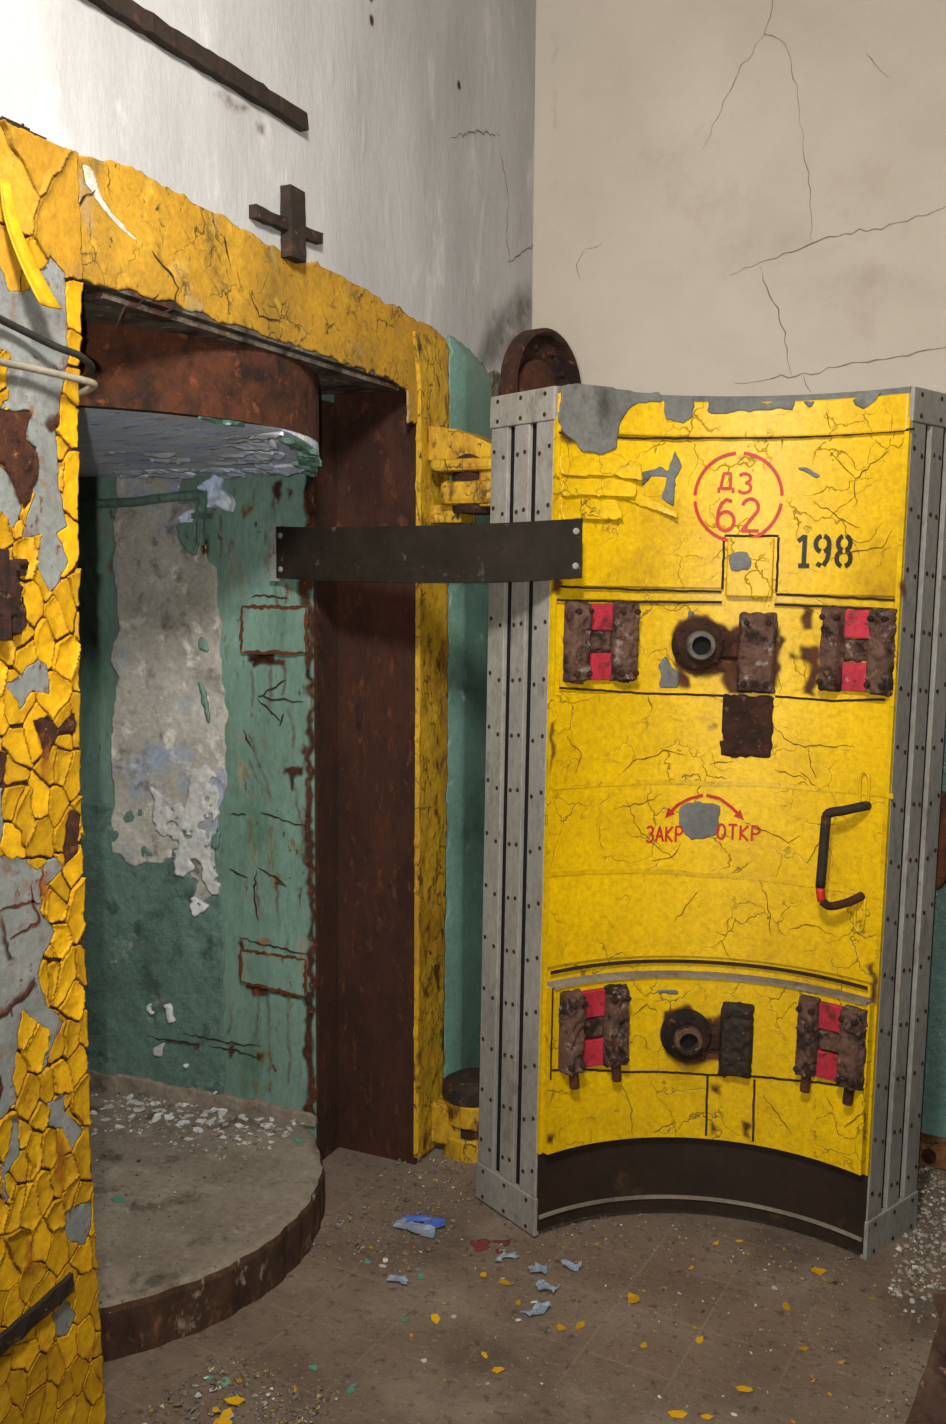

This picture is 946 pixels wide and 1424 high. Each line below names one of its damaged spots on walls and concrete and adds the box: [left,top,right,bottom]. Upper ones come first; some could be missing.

crack [706,0,946,560]
corrosion [0,410,60,508]
corrosion [273,476,317,527]
corrosion [36,717,77,771]
peeling [0,115,322,1424]
corrosion [64,810,80,865]
corrosion [238,580,318,1116]
corrosion [0,864,49,959]
corrosion [0,978,36,1018]